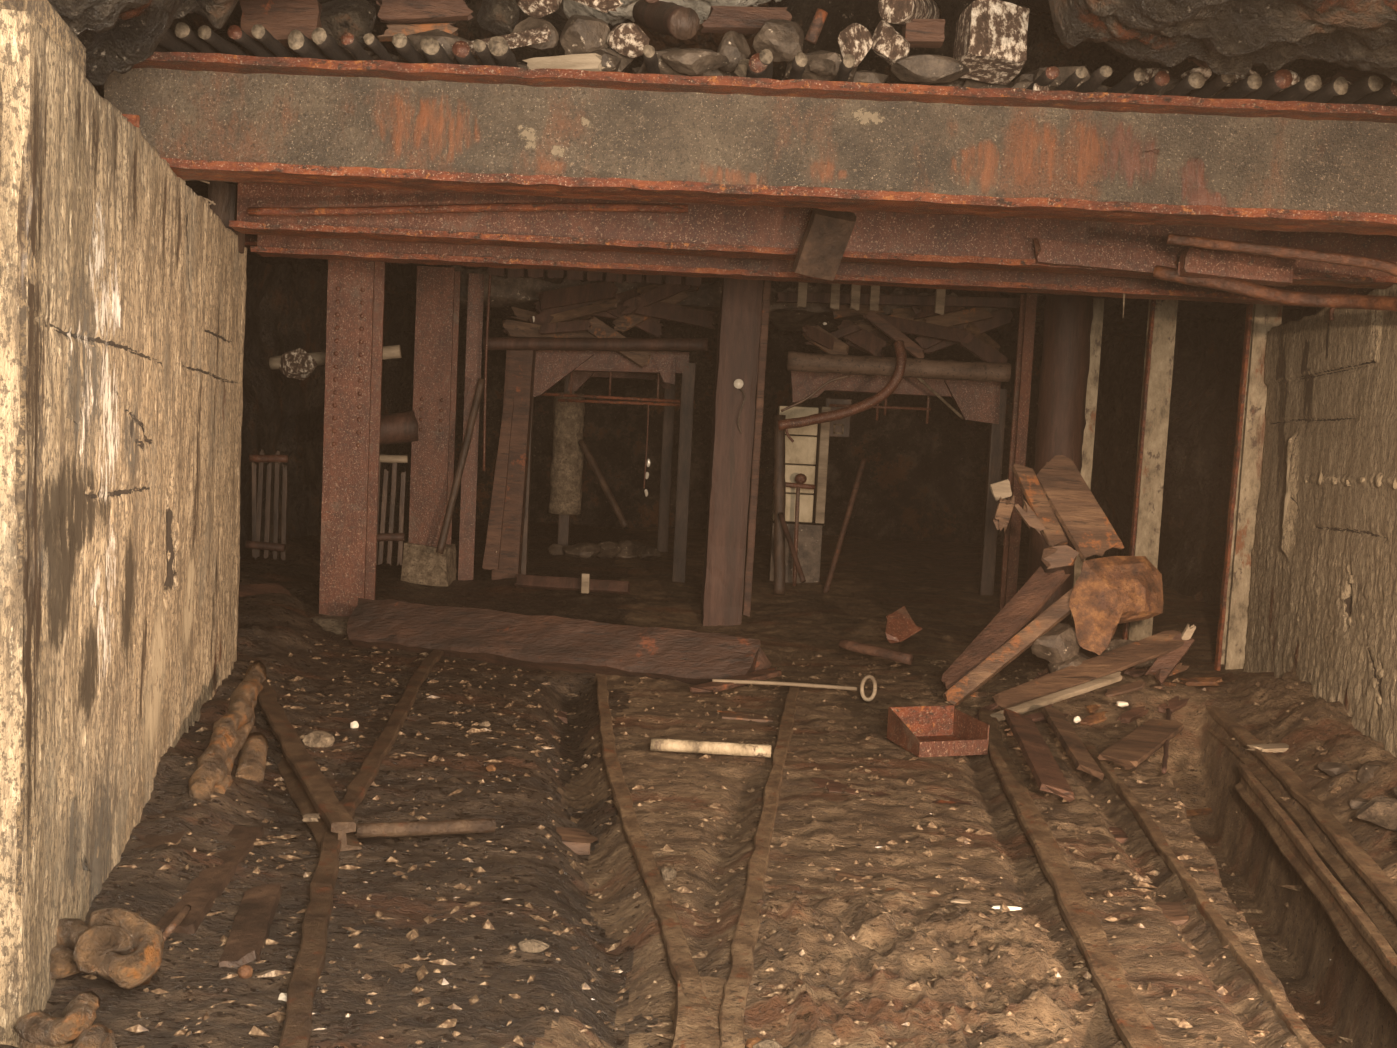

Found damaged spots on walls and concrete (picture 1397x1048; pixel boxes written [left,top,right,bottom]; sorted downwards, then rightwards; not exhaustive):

crack [45,324,239,384]